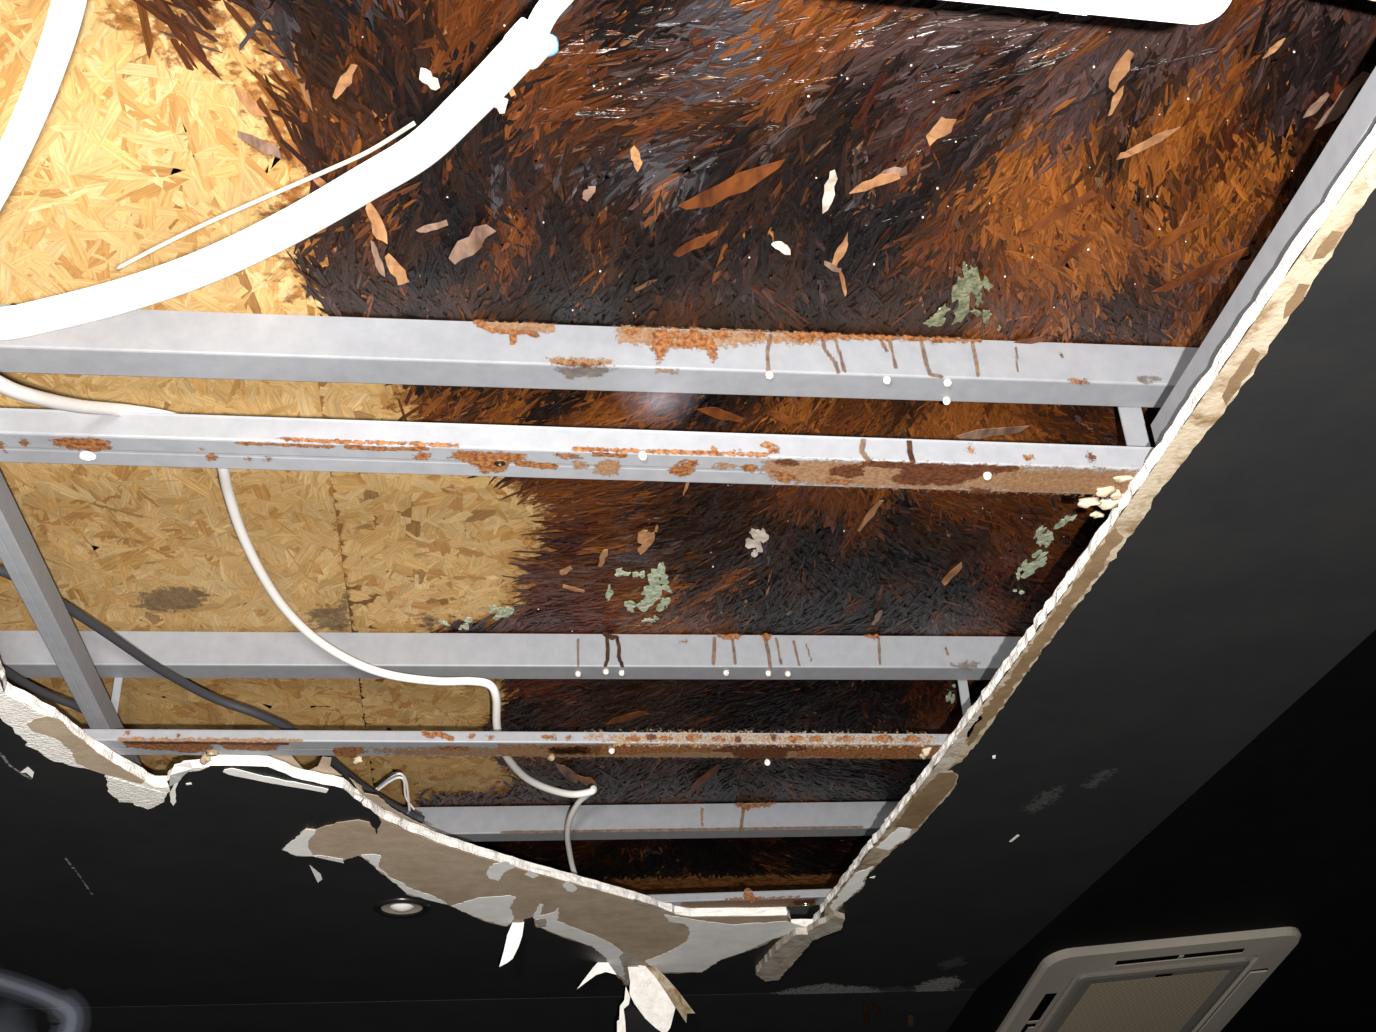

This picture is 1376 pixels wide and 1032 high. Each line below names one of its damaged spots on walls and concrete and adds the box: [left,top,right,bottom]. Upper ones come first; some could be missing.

damp [104,0,539,216]
damp [270,0,1376,348]
corrosion [473,319,555,345]
corrosion [615,325,982,378]
corrosion [52,437,112,452]
corrosion [235,437,1140,497]
damp [382,384,1127,446]
damp [412,476,1112,637]
damp [479,679,991,734]
corrosion [117,731,302,753]
corrosion [331,730,941,759]
damp [467,836,872,895]